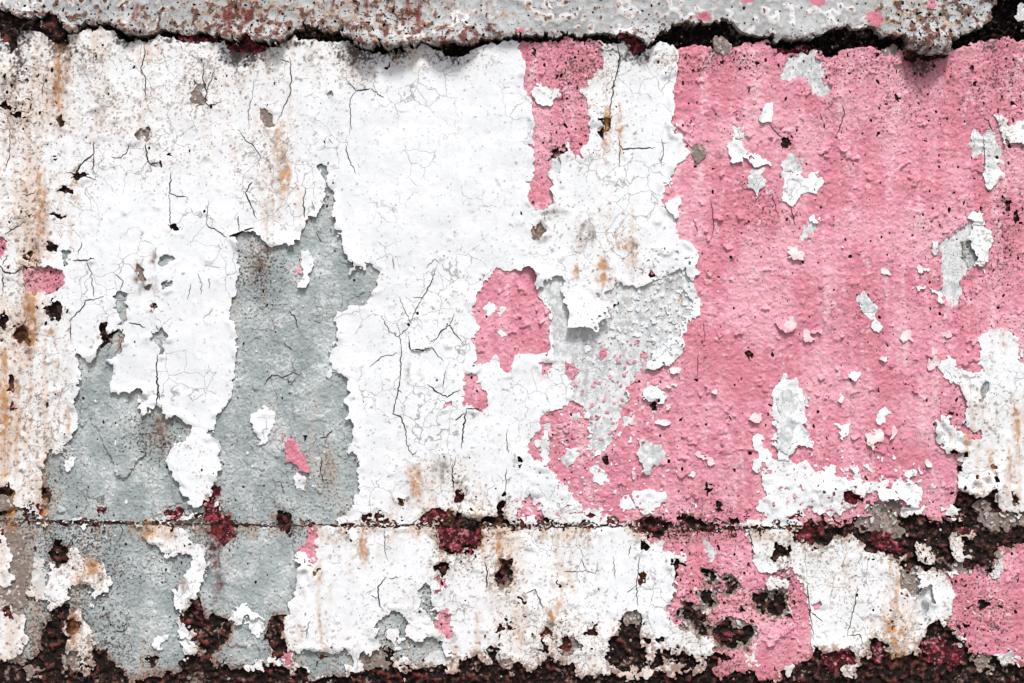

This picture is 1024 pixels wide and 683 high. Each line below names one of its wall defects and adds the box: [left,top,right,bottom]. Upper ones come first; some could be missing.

crack [67,81,261,237]
crack [279,57,292,117]
crack [329,77,383,174]
crack [70,243,123,341]
rust [0,355,32,450]
crack [130,322,160,405]
crack [372,259,483,487]
peeling [0,162,1024,683]
rust [0,496,175,543]
rust [300,517,440,560]
rust [481,519,569,553]
rust [671,510,802,536]